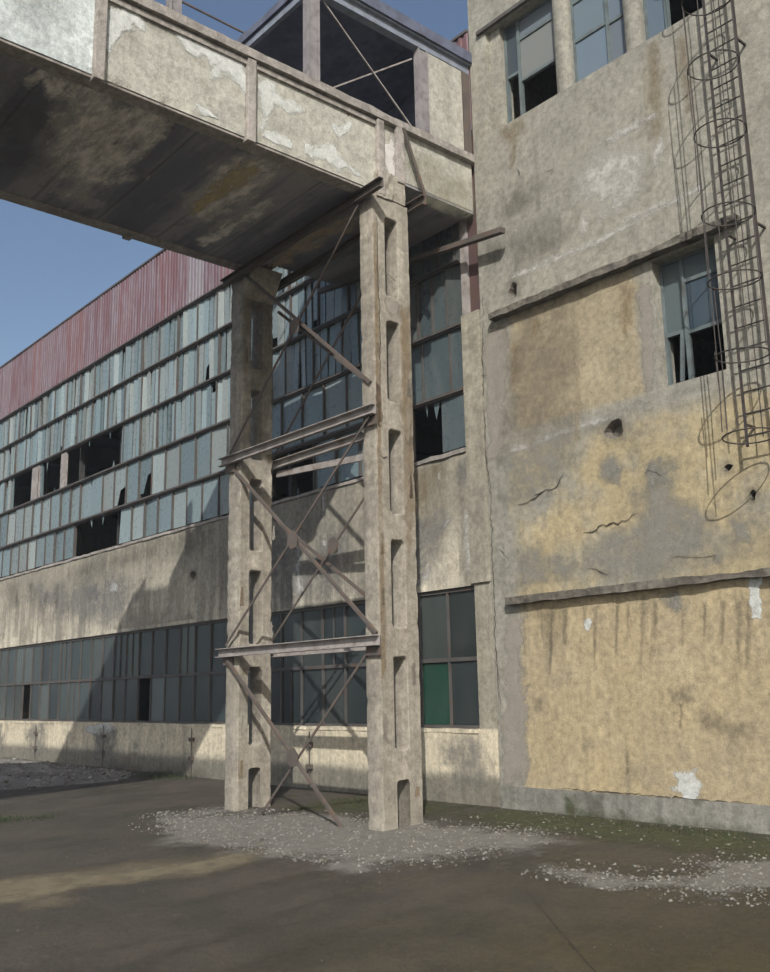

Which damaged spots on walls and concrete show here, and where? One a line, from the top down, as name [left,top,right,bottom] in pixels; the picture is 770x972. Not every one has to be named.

peeling [106,8,145,62]
peeling [175,32,246,93]
water stain [25,69,166,207]
peeling [258,80,306,148]
peeling [305,113,361,177]
water stain [186,156,275,247]
hole [604,418,623,439]
crack [481,300,508,713]
crack [518,475,563,505]
crack [584,514,634,533]
peeling [748,577,763,619]
peeling [672,769,702,799]